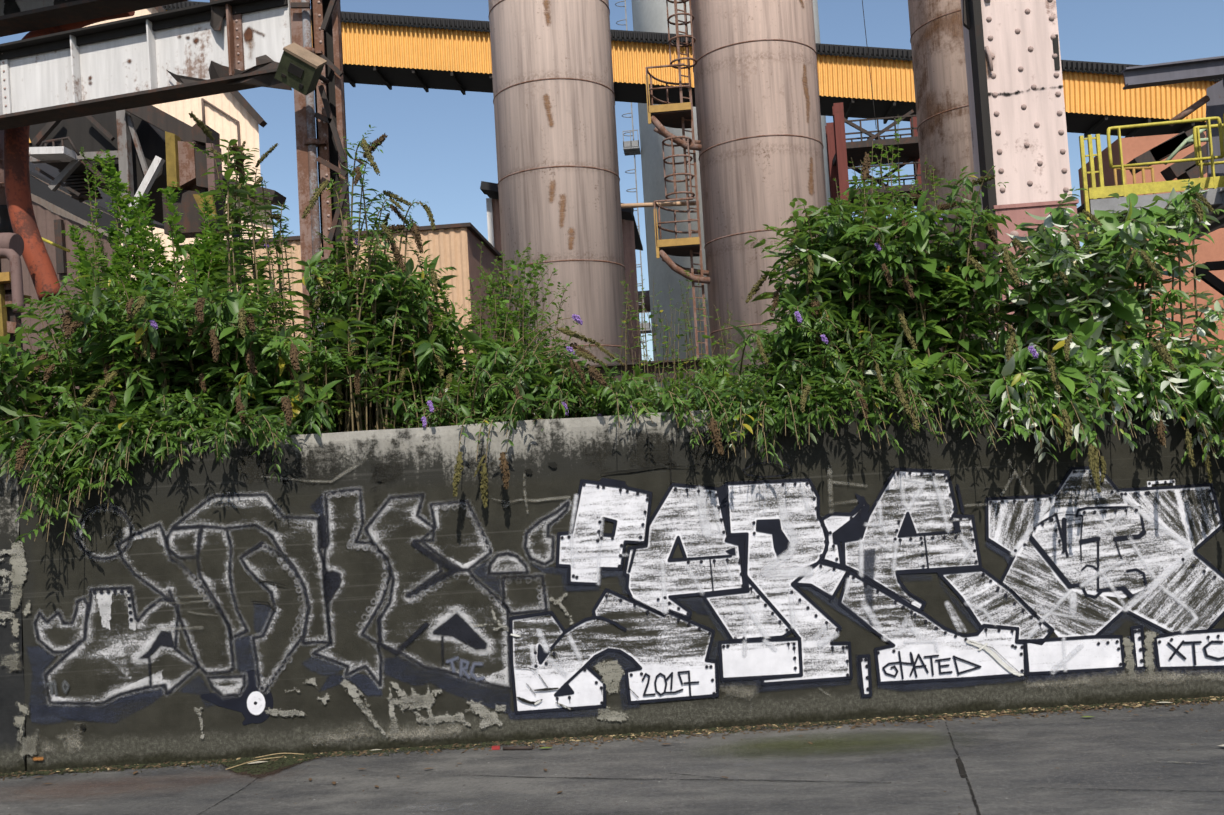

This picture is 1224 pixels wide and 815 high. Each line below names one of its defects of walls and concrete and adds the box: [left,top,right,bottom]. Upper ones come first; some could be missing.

rust [544,94,553,127]
rust [549,181,575,250]
water stain [238,442,339,485]
water stain [357,429,433,507]
water stain [628,429,671,467]
water stain [688,430,736,470]
peeling [0,541,30,670]
peeling [13,703,82,757]
peeling [285,677,330,705]
peeling [312,679,506,746]